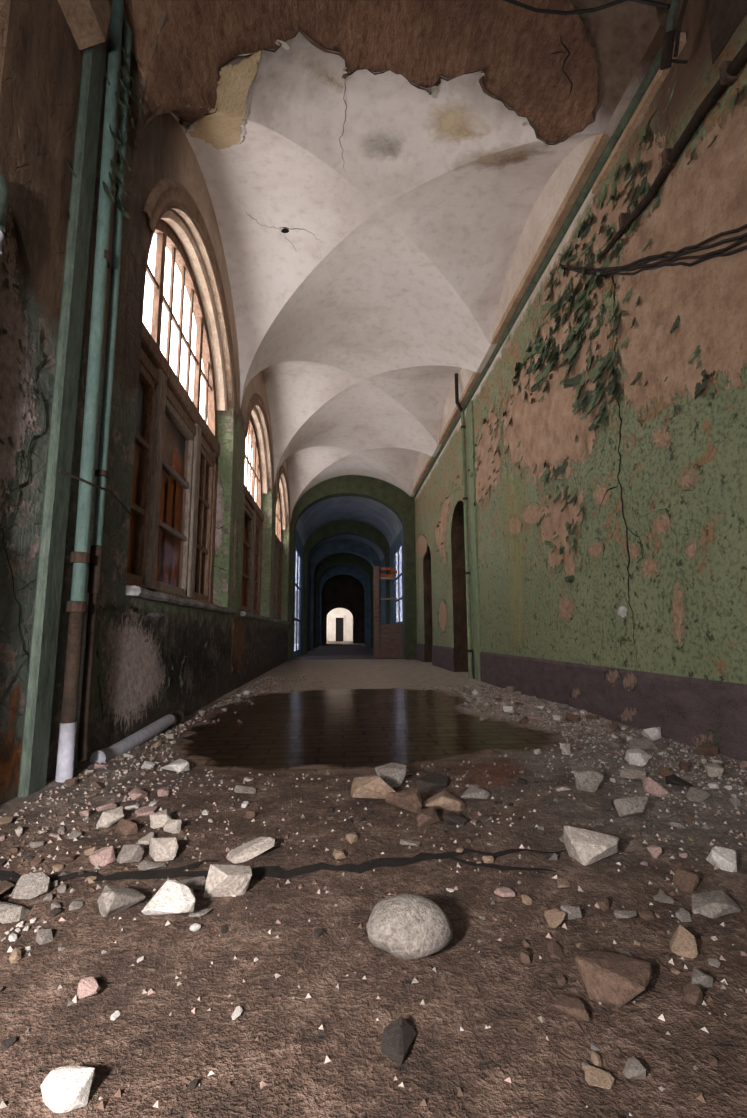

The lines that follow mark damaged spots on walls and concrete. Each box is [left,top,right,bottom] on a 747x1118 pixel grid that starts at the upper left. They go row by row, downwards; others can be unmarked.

flaking render [100,0,603,219]
peeling [0,204,45,552]
peeling [415,78,747,623]
crack [599,276,643,667]
peeling [670,578,688,649]
crack [0,870,21,882]
crack [49,860,219,882]
crack [251,849,567,879]